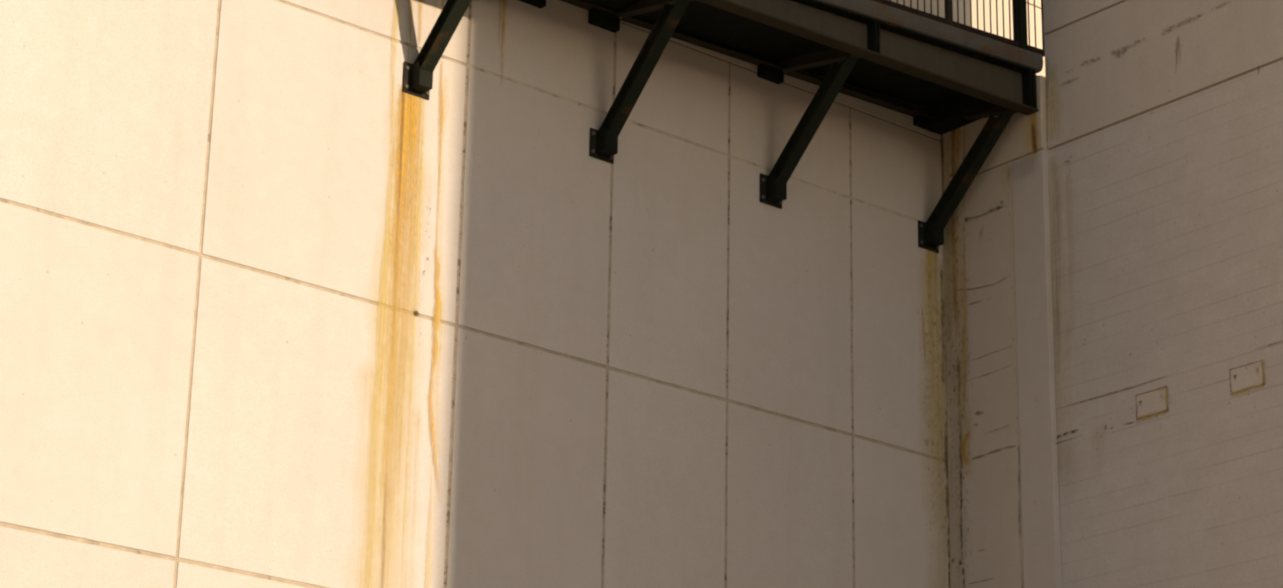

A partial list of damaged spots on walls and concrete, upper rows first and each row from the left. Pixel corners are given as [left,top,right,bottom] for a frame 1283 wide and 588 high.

rust [386,92,441,467]
damp [922,212,980,588]